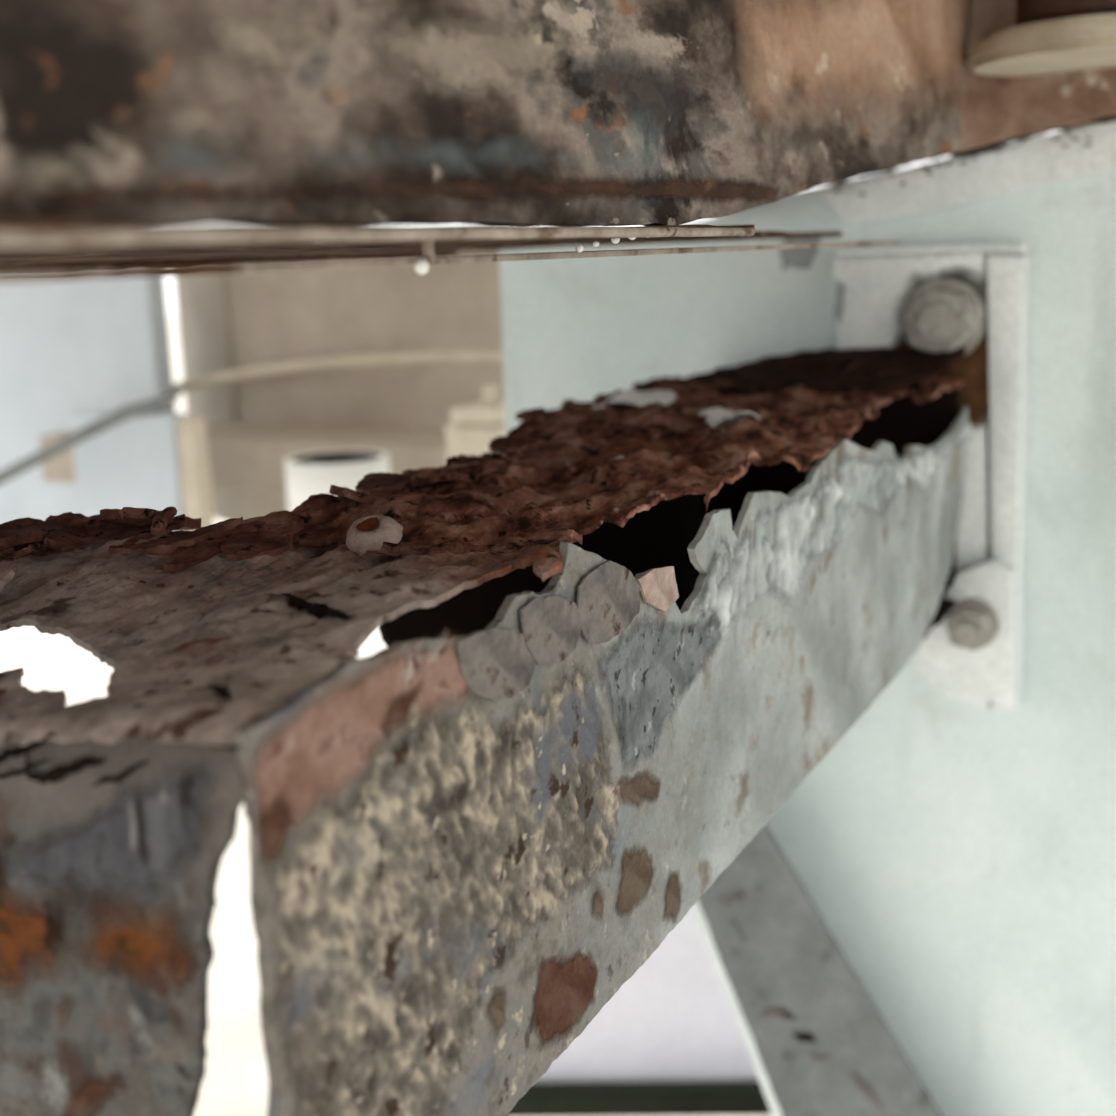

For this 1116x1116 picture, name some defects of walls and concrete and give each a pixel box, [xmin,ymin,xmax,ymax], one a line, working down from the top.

corrosion [489,432,527,453]
corrosion [515,399,601,422]
corrosion [938,334,989,427]
corrosion [329,466,481,504]
corrosion [0,507,338,573]
peeling [600,420,971,769]
corrosion [615,772,661,806]
corrosion [0,858,193,991]
corrosion [594,848,654,919]
corrosion [664,873,681,921]
corrosion [534,953,598,1045]